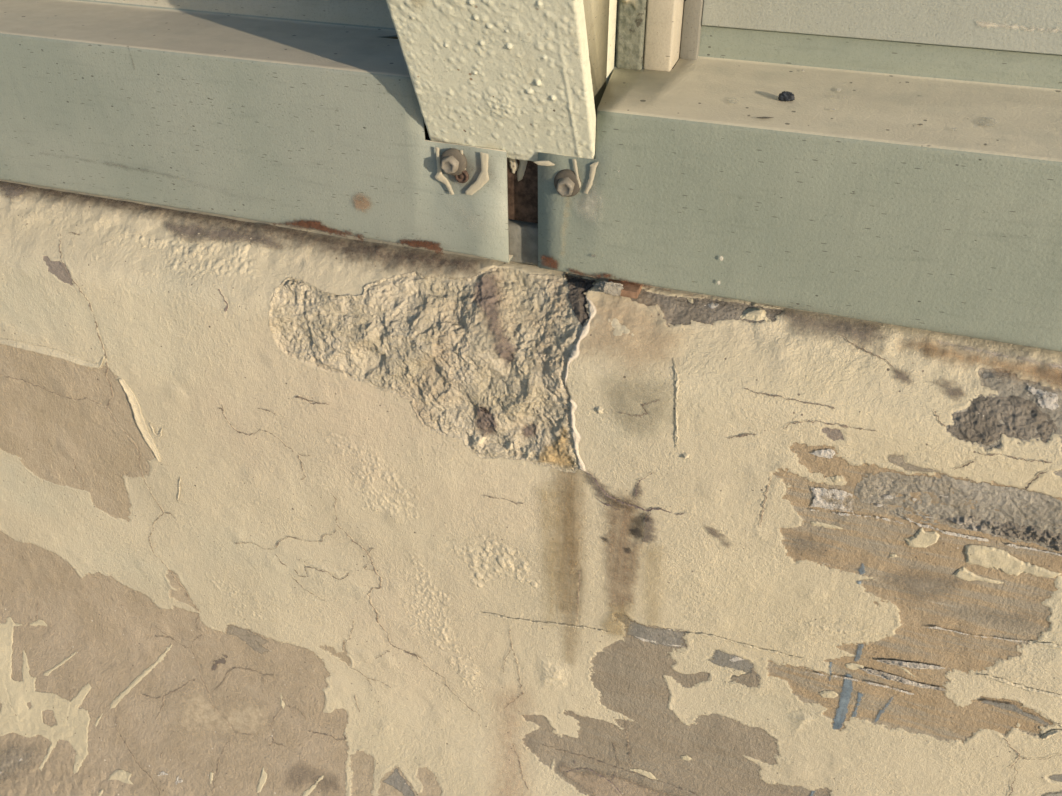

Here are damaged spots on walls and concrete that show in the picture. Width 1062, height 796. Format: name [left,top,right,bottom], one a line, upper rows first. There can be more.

peeling [0,339,161,522]
crack [0,223,347,796]
peeling [0,531,442,796]
crack [235,491,481,727]
spalling [268,267,598,474]
crack [503,631,524,709]
damp [586,474,654,542]
peeling [522,427,1062,796]
peeling [946,368,1062,452]